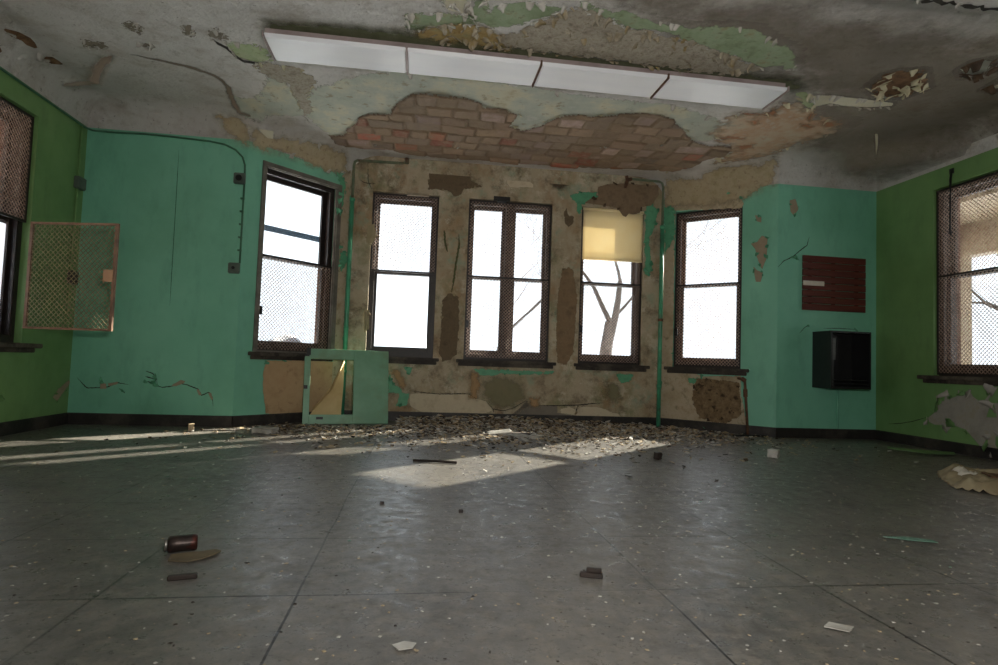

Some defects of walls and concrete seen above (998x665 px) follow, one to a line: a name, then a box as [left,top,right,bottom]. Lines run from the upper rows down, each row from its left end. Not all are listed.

peeling [404,0,797,77]
flaking render [208,27,737,197]
peeling [796,69,930,113]
peeling [263,170,351,414]
flaking render [439,293,460,362]
flaking render [556,267,578,365]
peeling [640,186,746,429]
peeling [751,236,769,282]
crack [79,371,213,401]
flaking render [398,393,492,413]
flaking render [560,406,621,417]
peeling [923,383,998,458]